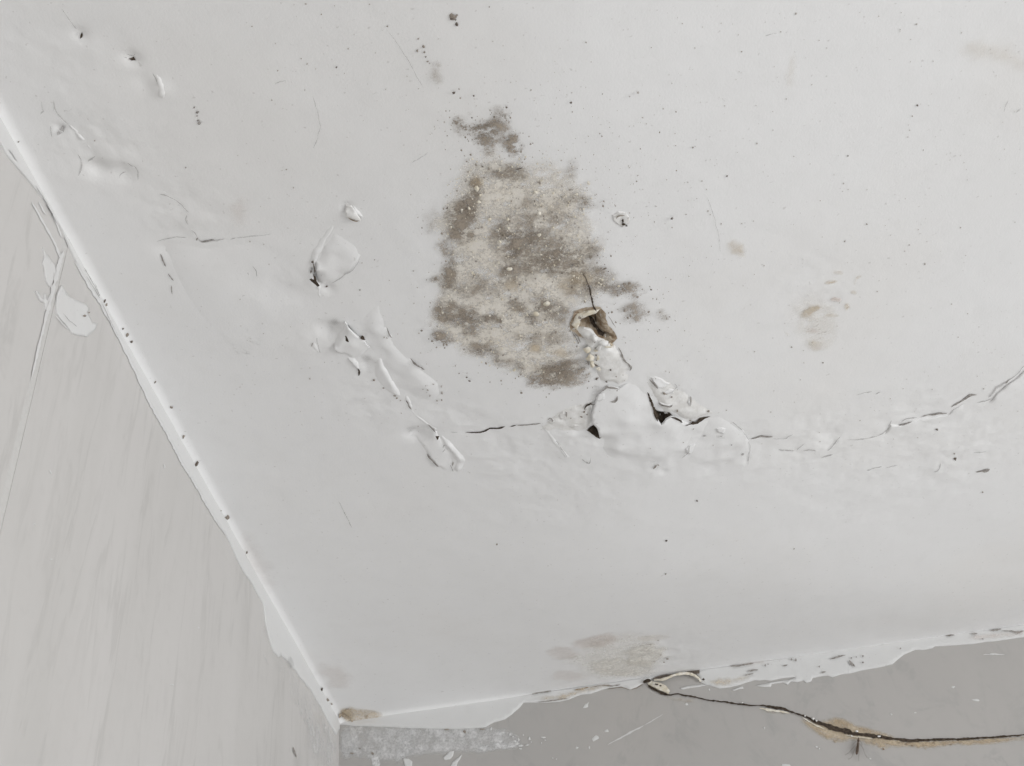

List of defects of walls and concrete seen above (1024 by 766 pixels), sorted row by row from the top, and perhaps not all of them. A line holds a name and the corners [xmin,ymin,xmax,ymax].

peeling [309,225,360,298]
mould [417,106,685,398]
peeling [334,321,370,376]
peeling [405,396,465,472]
crack [467,423,541,433]
peeling [542,307,712,462]
crack [752,371,1024,457]
peeling [643,670,705,696]
crack [533,683,1024,742]